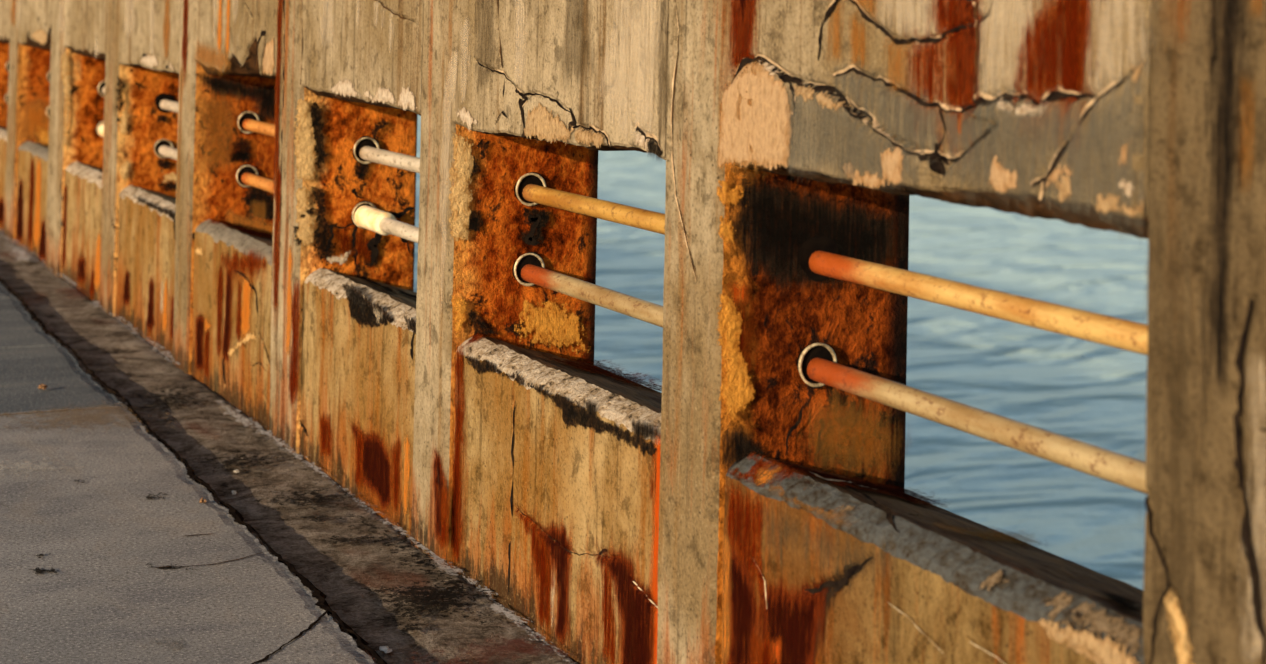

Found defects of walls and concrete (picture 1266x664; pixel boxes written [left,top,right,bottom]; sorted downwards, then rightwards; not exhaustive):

rust [195,0,300,403]
crack [327,188,415,266]
crack [476,0,697,280]
spalling [717,62,851,244]
spalling [843,145,903,192]
crack [731,0,1139,200]
spalling [988,155,1017,194]
peeling [716,285,759,421]
crack [0,278,388,664]
rust [516,508,572,645]
rust [595,438,661,664]
rust [722,453,943,664]